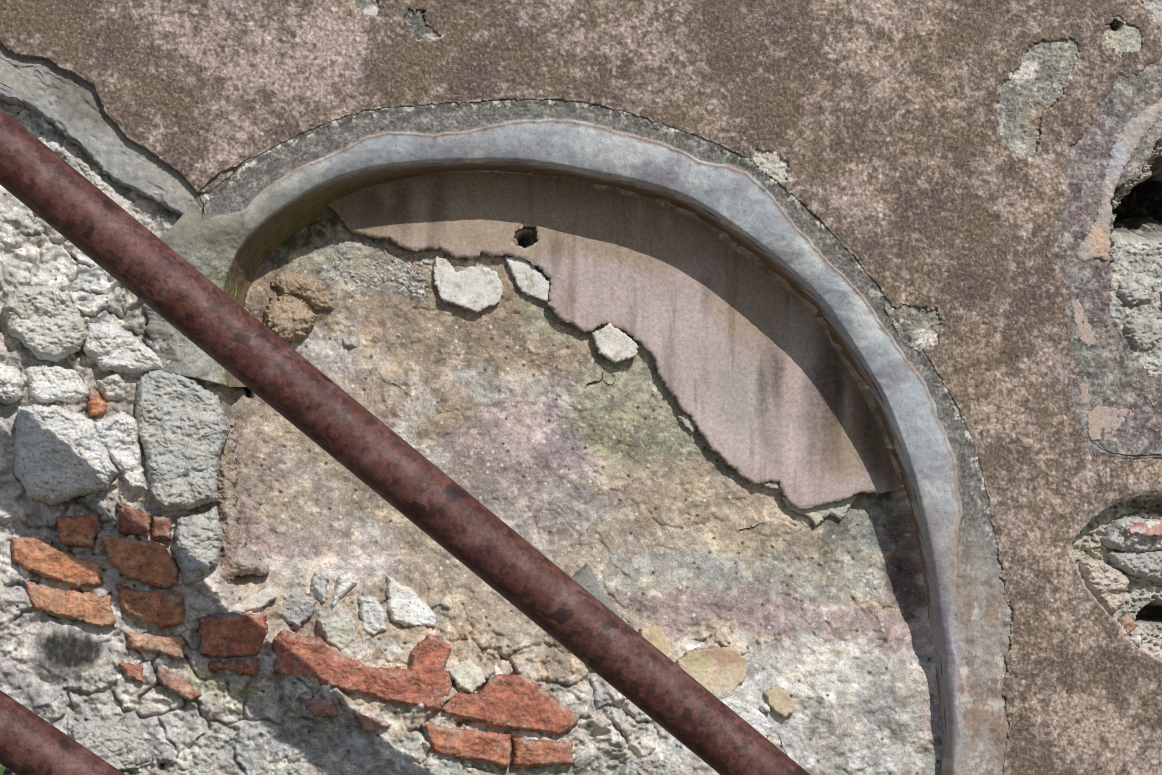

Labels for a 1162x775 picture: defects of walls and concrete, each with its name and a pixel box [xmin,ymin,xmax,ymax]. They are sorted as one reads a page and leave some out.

flaking render [1141,0,1162,19]
flaking render [1104,15,1143,58]
flaking render [996,38,1079,160]
flaking render [433,256,550,313]
flaking render [1048,54,1162,464]
flaking render [592,323,639,364]
flaking render [884,300,945,352]
flaking render [761,481,858,526]
flaking render [1071,495,1162,661]
flaking render [639,625,748,693]
flaking render [763,684,797,718]